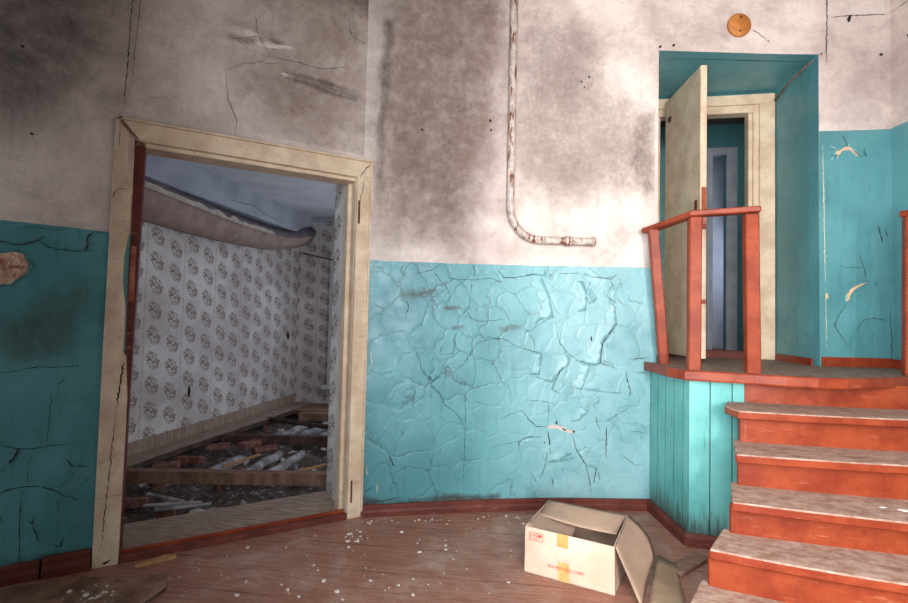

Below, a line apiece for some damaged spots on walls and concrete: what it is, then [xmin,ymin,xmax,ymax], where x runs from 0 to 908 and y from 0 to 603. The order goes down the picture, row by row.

crack [115,0,141,143]
crack [226,12,348,132]
crack [826,0,907,58]
peeling [830,135,867,160]
flaking render [0,250,32,288]
crack [0,226,108,252]
crack [400,265,644,492]
crack [0,363,124,565]